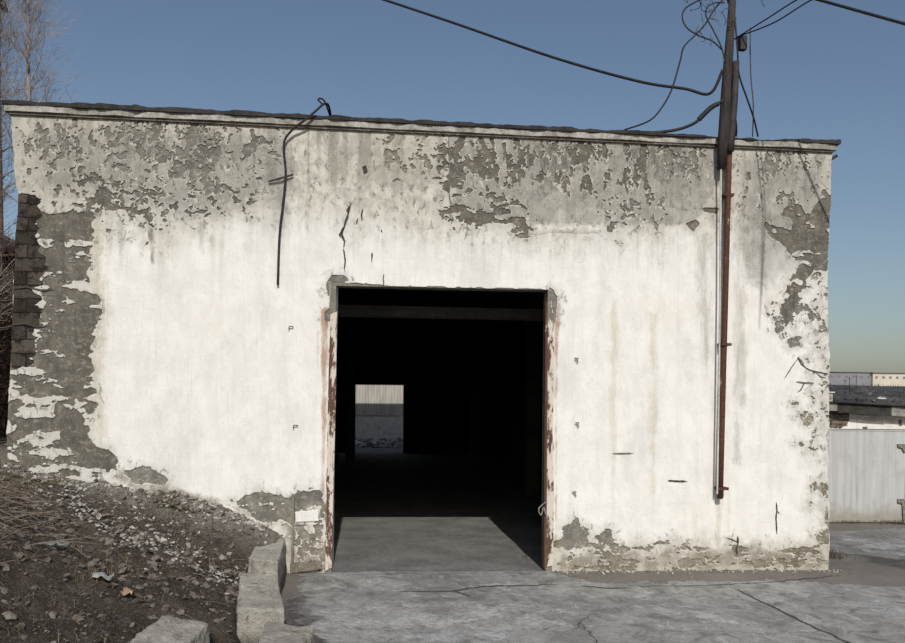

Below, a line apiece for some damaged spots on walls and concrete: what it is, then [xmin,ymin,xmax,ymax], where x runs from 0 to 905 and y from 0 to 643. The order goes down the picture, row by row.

peeling [373,135,709,244]
crack [339,204,363,272]
peeling [737,151,831,349]
peeling [7,118,281,486]
spalling [791,359,850,451]
peeling [230,488,327,572]
spalling [553,515,829,571]
spalling [810,482,829,501]
crack [685,574,851,643]